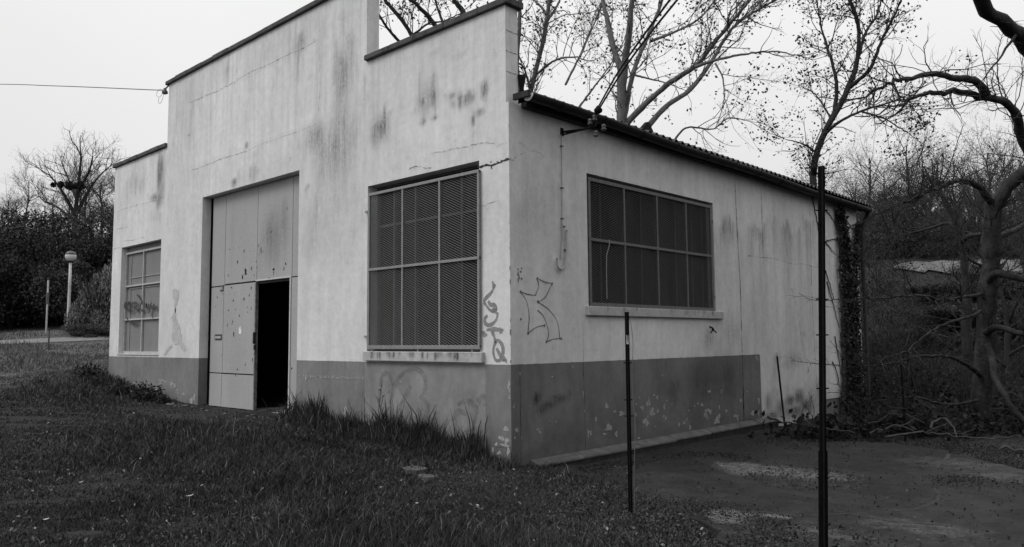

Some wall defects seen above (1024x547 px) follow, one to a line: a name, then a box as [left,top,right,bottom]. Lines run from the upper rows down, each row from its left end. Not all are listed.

crack [449,142,516,169]
peeling [583,388,760,438]
peeling [491,426,522,462]